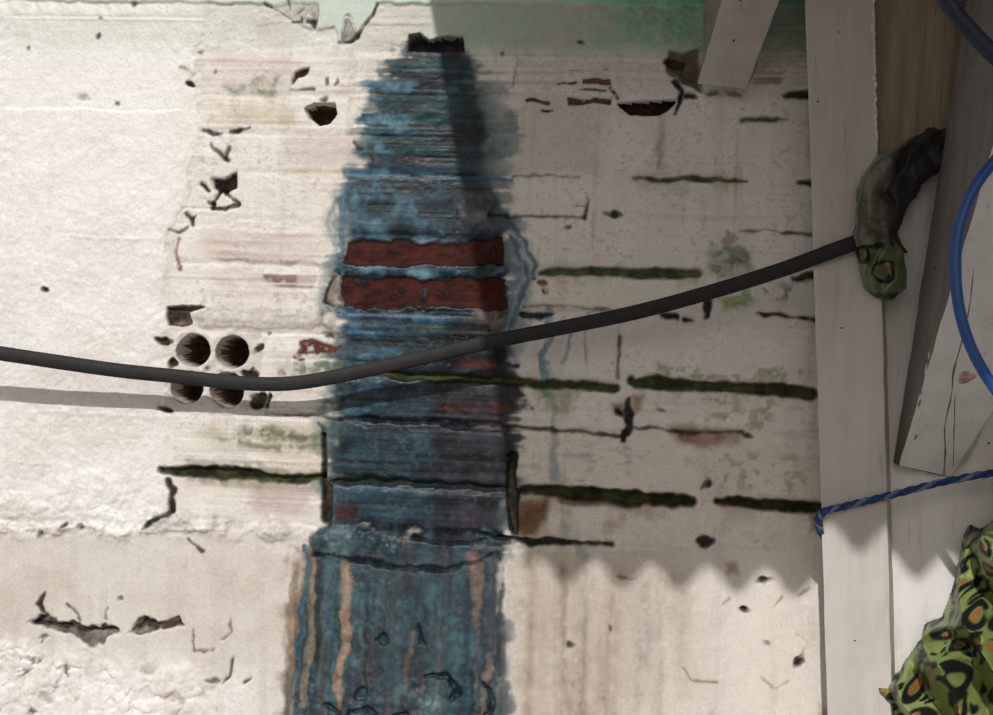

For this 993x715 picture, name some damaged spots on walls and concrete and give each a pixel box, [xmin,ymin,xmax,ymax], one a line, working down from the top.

spalling [273,1,319,29]
spalling [339,18,361,43]
crack [206,128,250,162]
crack [176,212,195,233]
damp [323,41,537,369]
peeling [324,237,508,311]
damp [538,337,553,397]
crack [143,336,821,574]
damp [282,346,522,715]
spalling [31,593,119,646]
spalling [133,616,183,634]